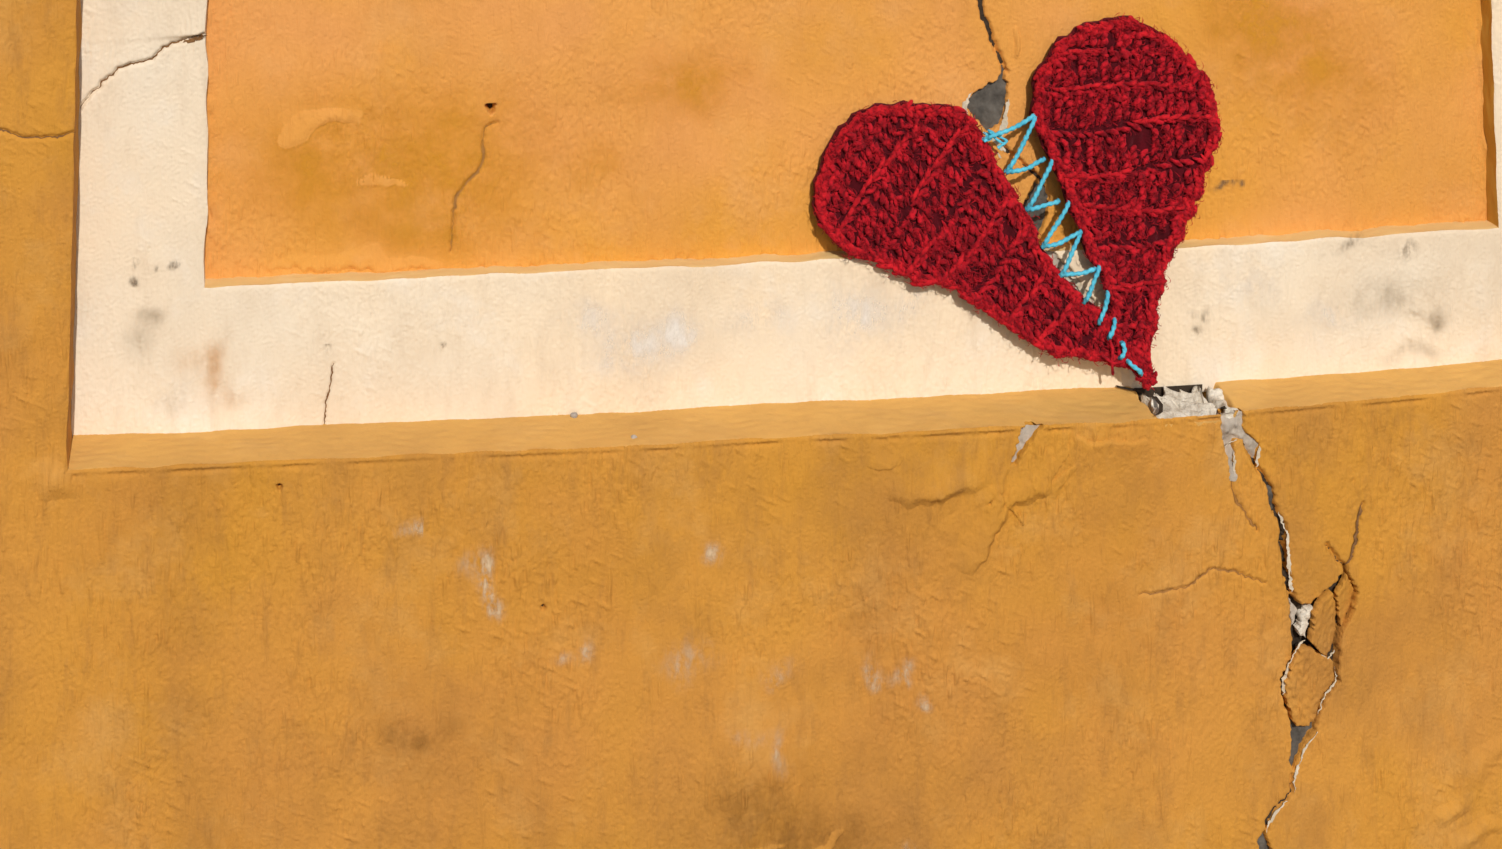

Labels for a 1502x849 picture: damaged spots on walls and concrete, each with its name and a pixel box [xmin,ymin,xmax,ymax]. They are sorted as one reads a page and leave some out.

crack [0,33,208,139]
crack [450,122,497,251]
crack [962,0,1097,307]
peeling [1134,384,1202,402]
crack [1141,406,1362,849]